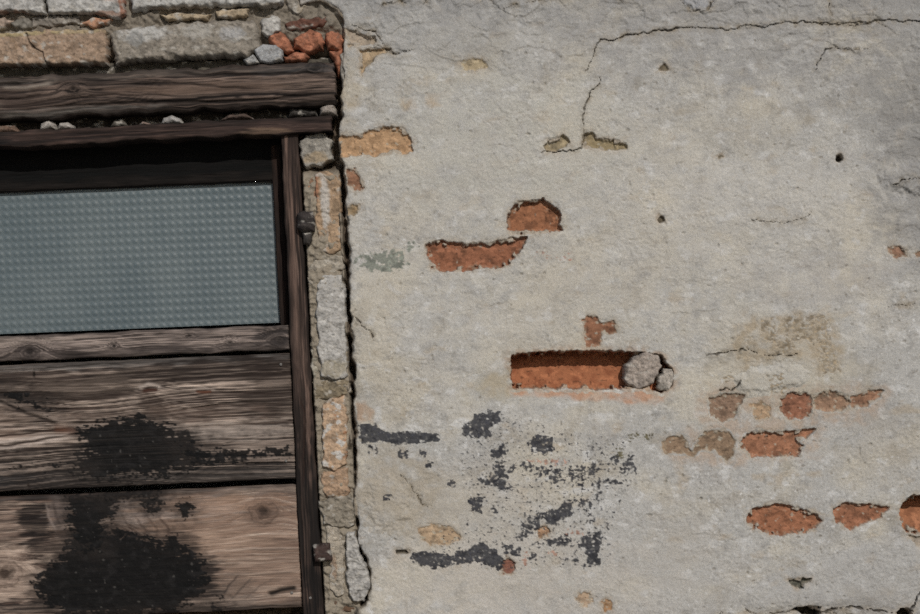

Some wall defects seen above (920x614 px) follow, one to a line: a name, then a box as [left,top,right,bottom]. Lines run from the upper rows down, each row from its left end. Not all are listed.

crack [351,25,414,55]
crack [541,0,920,154]
spalling [0,0,567,614]
flaking render [410,304,886,575]
crack [745,606,793,614]
flaking render [745,493,920,614]
crack [815,592,920,614]